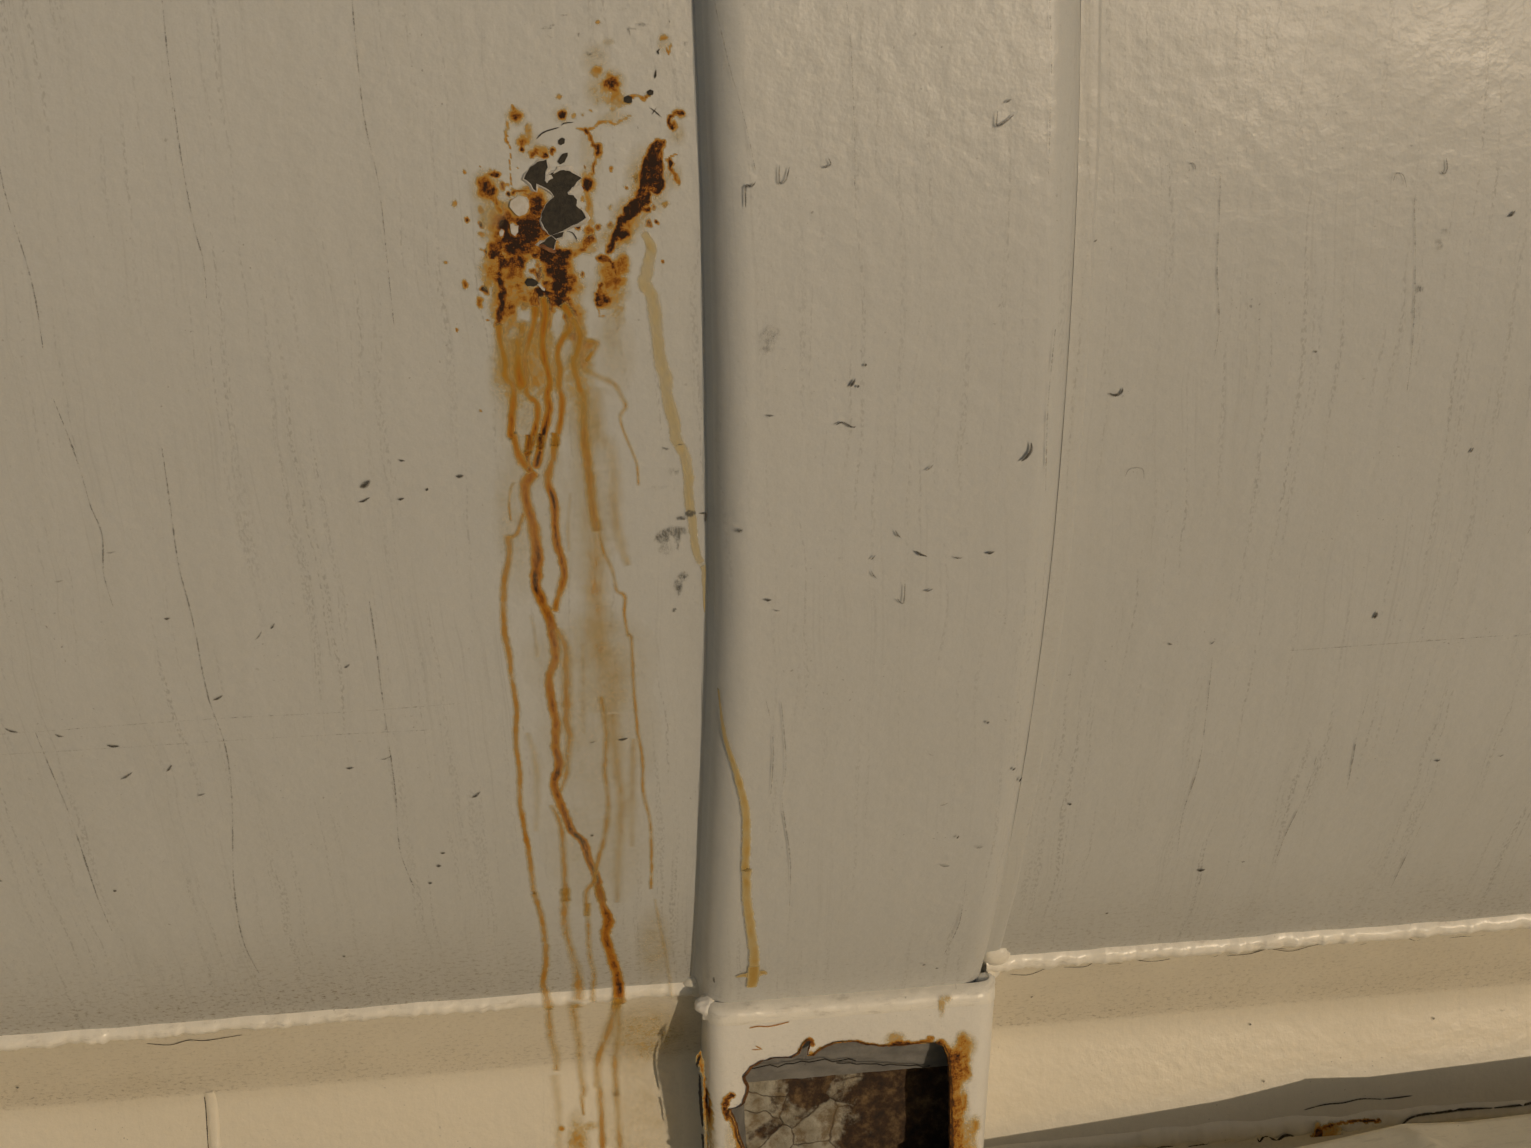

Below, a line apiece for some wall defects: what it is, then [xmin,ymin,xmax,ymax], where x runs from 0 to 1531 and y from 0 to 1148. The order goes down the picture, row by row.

peeling [499,138,590,253]
peeling [525,278,545,291]
rust [452,65,706,1148]
rust [717,689,767,988]
rust [721,1092,741,1148]
rust [797,1032,980,1148]